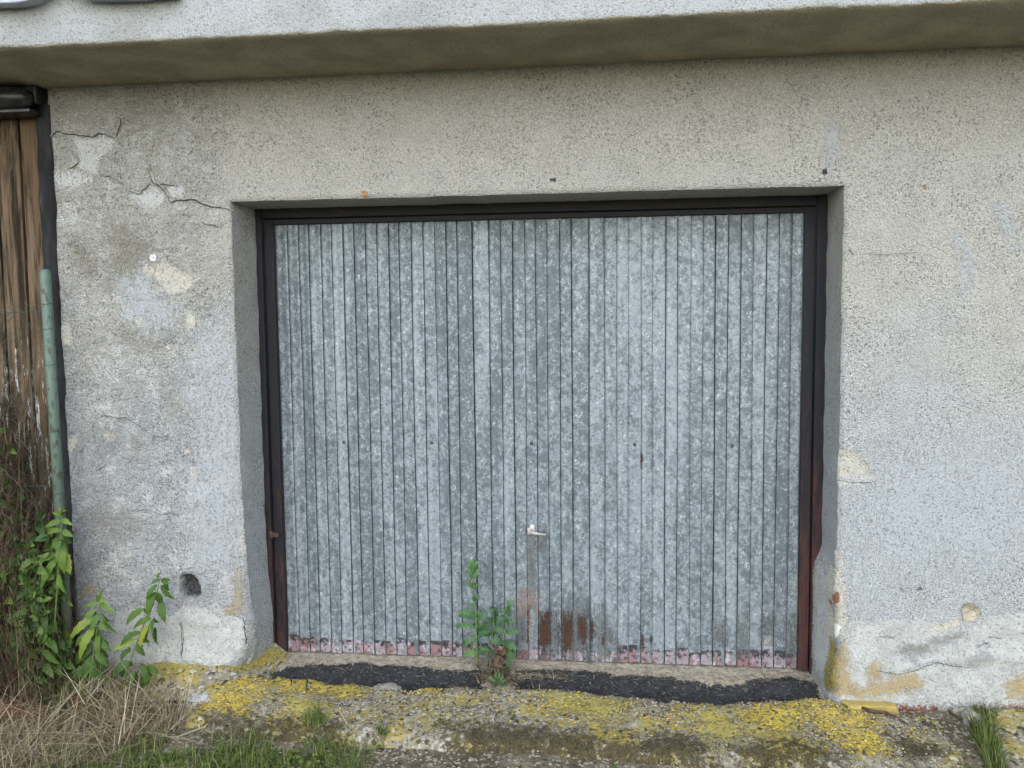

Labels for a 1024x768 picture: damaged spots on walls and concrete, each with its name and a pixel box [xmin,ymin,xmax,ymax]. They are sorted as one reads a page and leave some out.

crack [50,118,233,227]
rust [517,595,604,658]
flaking render [184,549,1024,768]
crack [877,634,1002,675]